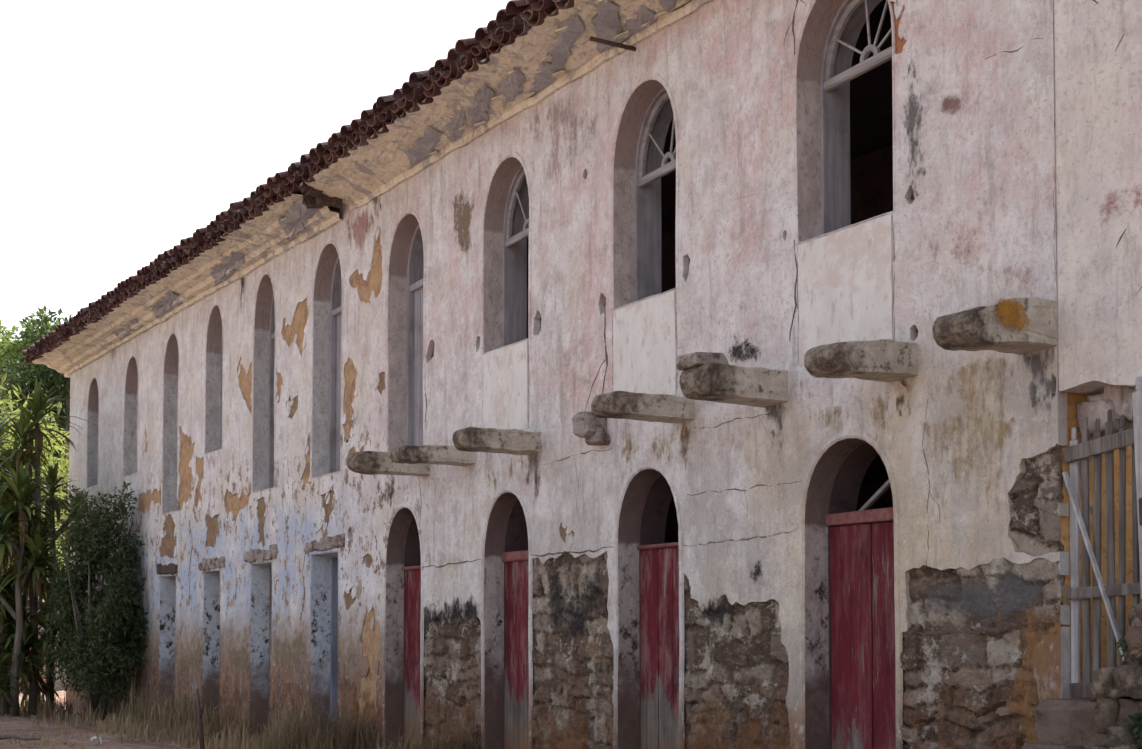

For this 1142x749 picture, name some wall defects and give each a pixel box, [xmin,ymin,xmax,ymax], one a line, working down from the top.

flaking render [404,0,691,172]
crack [784,0,807,55]
leakage [905,65,925,196]
flaking render [350,226,382,308]
crack [789,240,799,342]
flaking render [342,358,364,460]
flaking render [373,366,385,395]
flaking render [139,426,267,558]
flaking render [423,604,482,749]
flaking render [531,520,614,749]
flaking render [684,574,790,749]
flaking render [900,445,1066,749]